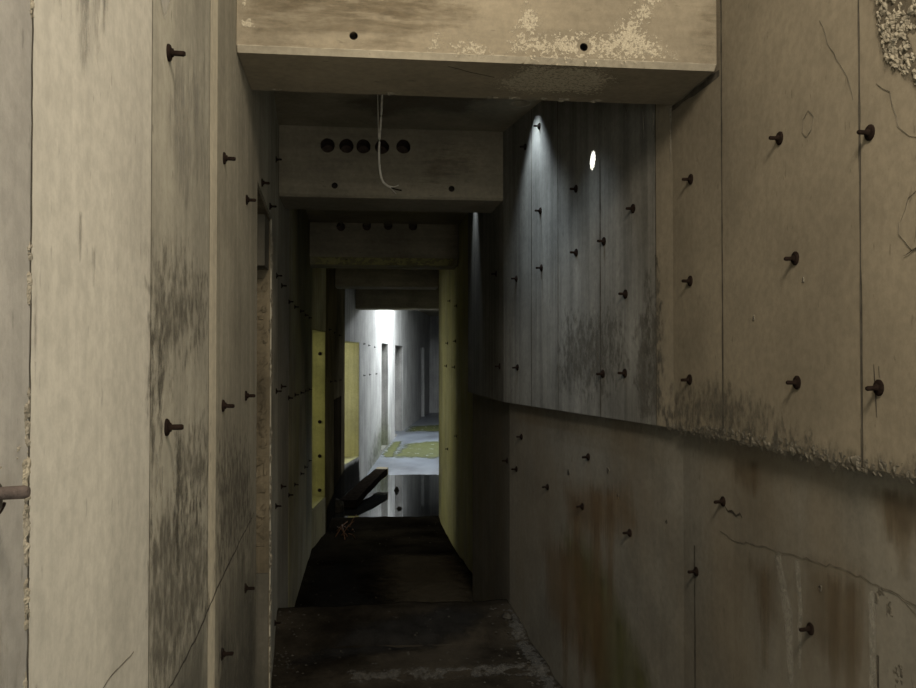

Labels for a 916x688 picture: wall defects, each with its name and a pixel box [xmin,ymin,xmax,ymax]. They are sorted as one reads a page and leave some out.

peeling [487,0,678,103]
spalling [875,0,916,86]
water stain [151,253,201,406]
water stain [151,439,208,688]
crack [169,513,254,688]
crack [723,507,916,615]